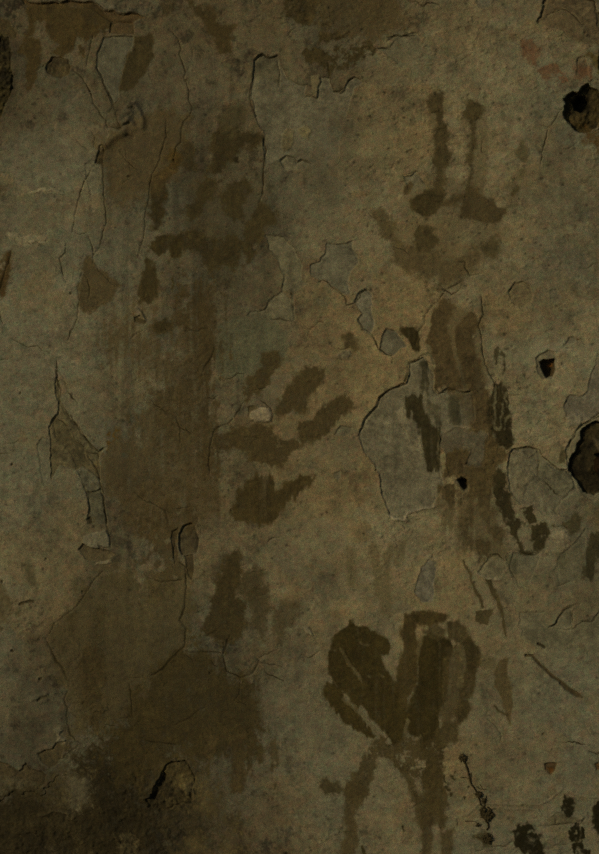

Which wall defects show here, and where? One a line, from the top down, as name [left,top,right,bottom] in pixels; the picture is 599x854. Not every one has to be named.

crack [537,0,599,25]
crack [540,108,599,164]
spalling [48,373,116,566]
damp [38,102,304,813]
peeling [507,354,599,517]